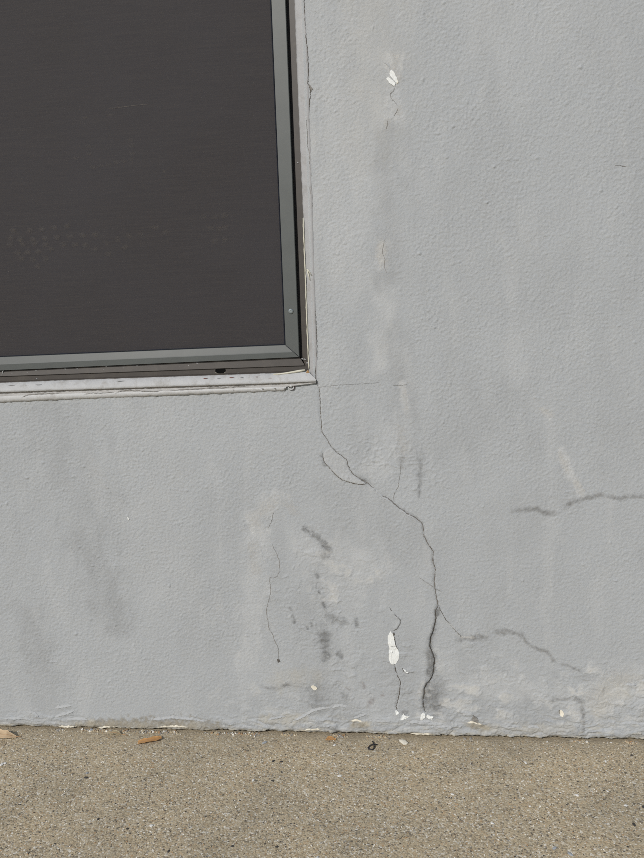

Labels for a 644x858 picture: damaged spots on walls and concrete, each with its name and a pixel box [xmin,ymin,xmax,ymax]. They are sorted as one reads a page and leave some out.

peeling [383,54,400,86]
crack [315,311,462,711]
crack [266,513,280,663]
peeling [387,631,399,665]